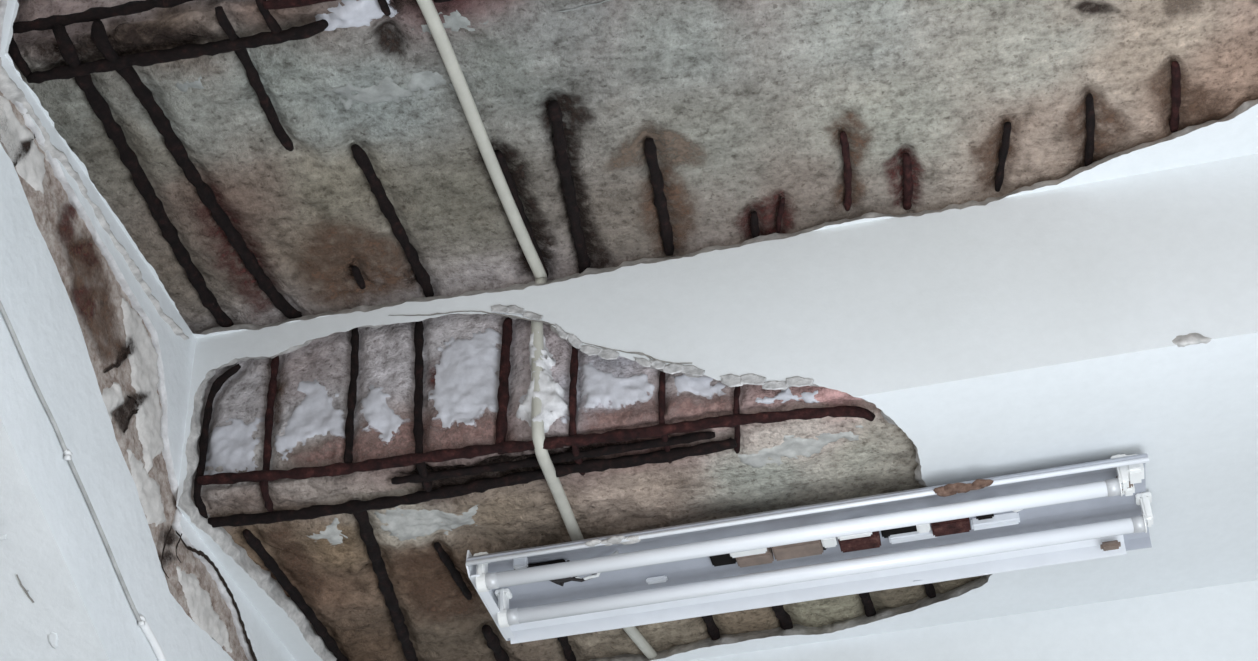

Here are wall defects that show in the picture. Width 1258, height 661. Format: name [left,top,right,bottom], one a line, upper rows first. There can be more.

corrosion [31,23,215,67]
corrosion [376,0,418,54]
corrosion [1076,1,1113,14]
corrosion [478,143,554,274]
corrosion [542,93,611,269]
spalling [8,0,1258,335]
corrosion [738,192,793,239]
corrosion [886,148,923,205]
corrosion [60,205,135,365]
spalling [0,57,992,661]
corrosion [112,394,148,433]
corrosion [297,397,734,490]